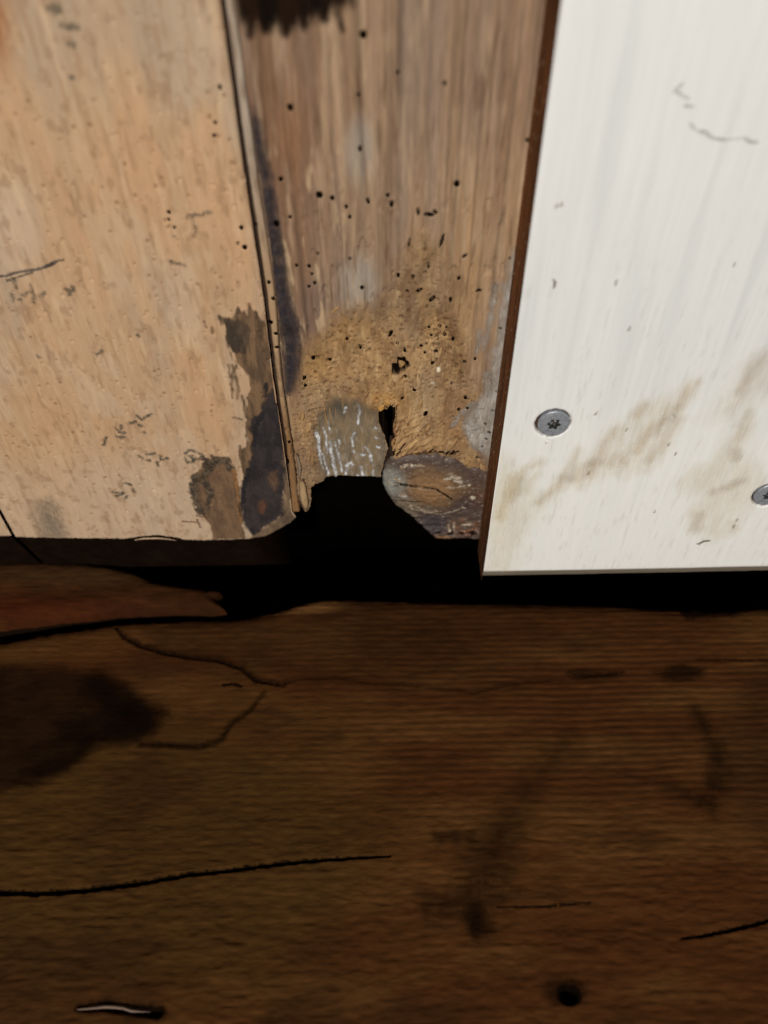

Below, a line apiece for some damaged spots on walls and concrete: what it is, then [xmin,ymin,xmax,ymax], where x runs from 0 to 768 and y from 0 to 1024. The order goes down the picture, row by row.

leakage [236,0,351,37]
leakage [239,120,302,538]
spalling [377,356,423,459]
peeling [296,451,314,510]
leakage [0,667,159,789]
crack [1,621,312,749]
crack [0,856,391,897]
crack [684,919,768,939]